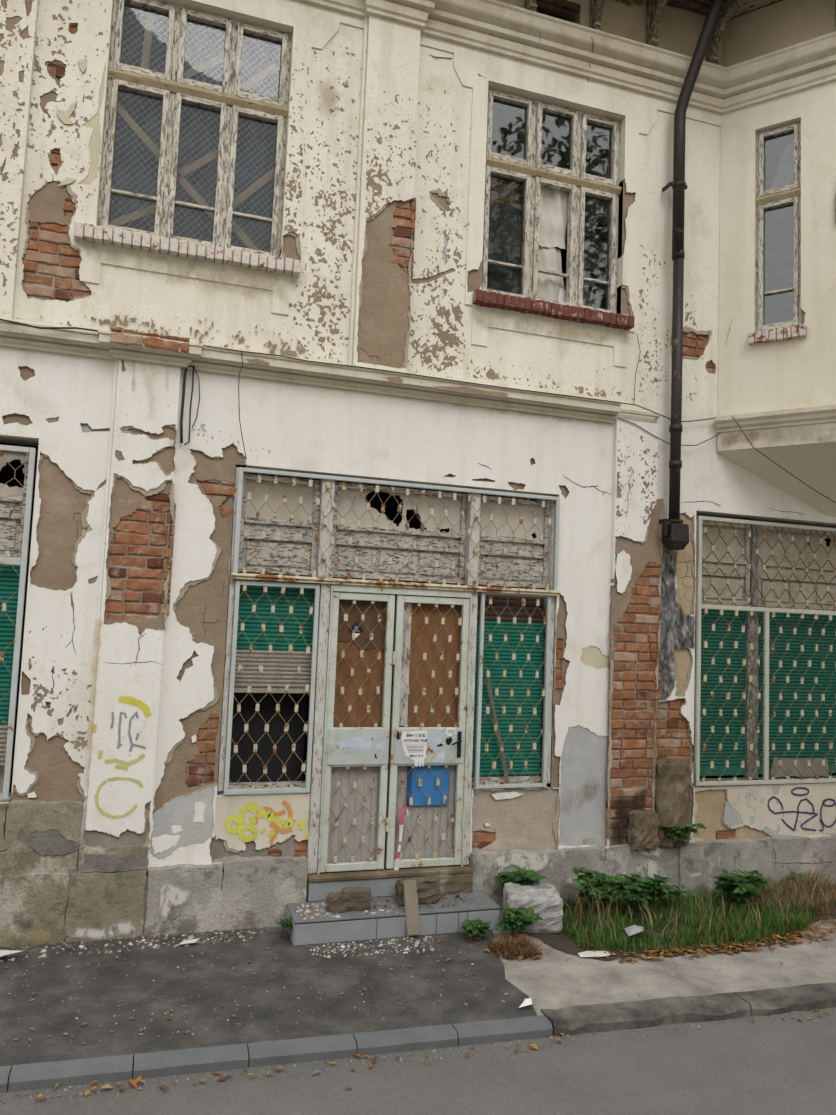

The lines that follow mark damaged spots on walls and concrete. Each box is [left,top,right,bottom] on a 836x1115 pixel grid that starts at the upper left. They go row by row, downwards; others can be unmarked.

flaking render [19,367,35,381]
flaking render [0,0,109,319]
flaking render [84,46,715,401]
flaking render [8,647,92,803]
flaking render [26,424,308,873]
flaking render [471,428,836,893]